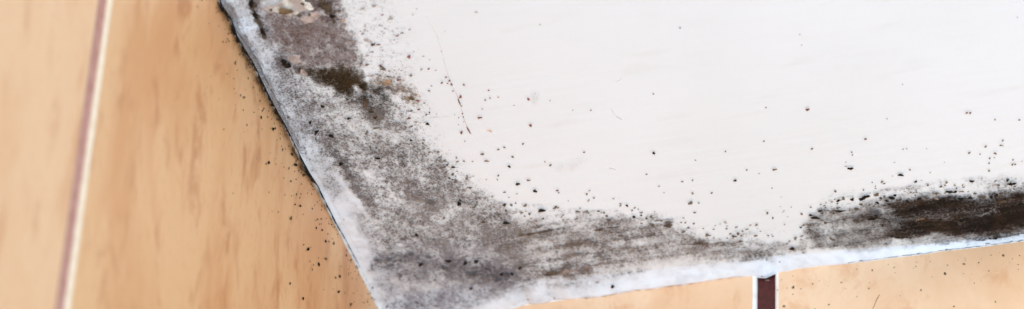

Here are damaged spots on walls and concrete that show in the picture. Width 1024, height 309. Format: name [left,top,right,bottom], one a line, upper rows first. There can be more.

leakage [216,0,1024,309]